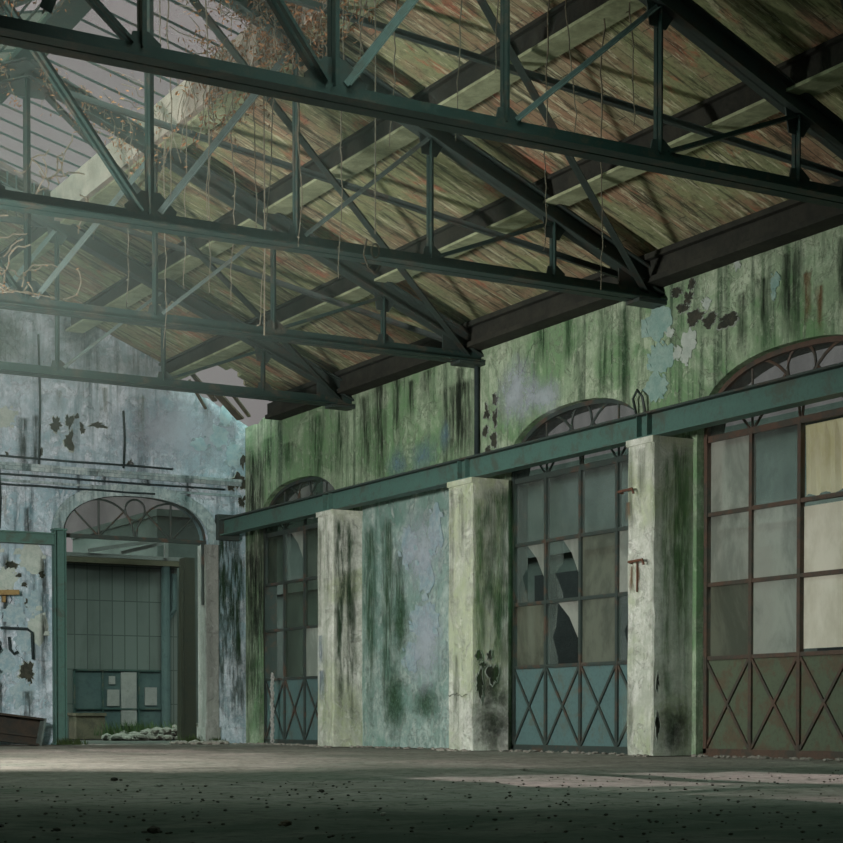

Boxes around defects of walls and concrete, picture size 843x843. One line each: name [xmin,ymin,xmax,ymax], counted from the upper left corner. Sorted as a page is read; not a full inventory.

flaking render [49,413,108,453]
damp [362,385,383,460]
damp [442,369,470,445]
peeling [641,277,740,402]
damp [783,253,797,319]
peeling [0,544,50,710]
damp [218,529,263,696]
damp [336,521,355,690]
damp [366,524,437,676]
spalling [474,649,500,703]
damp [476,491,513,647]
damp [662,449,689,633]